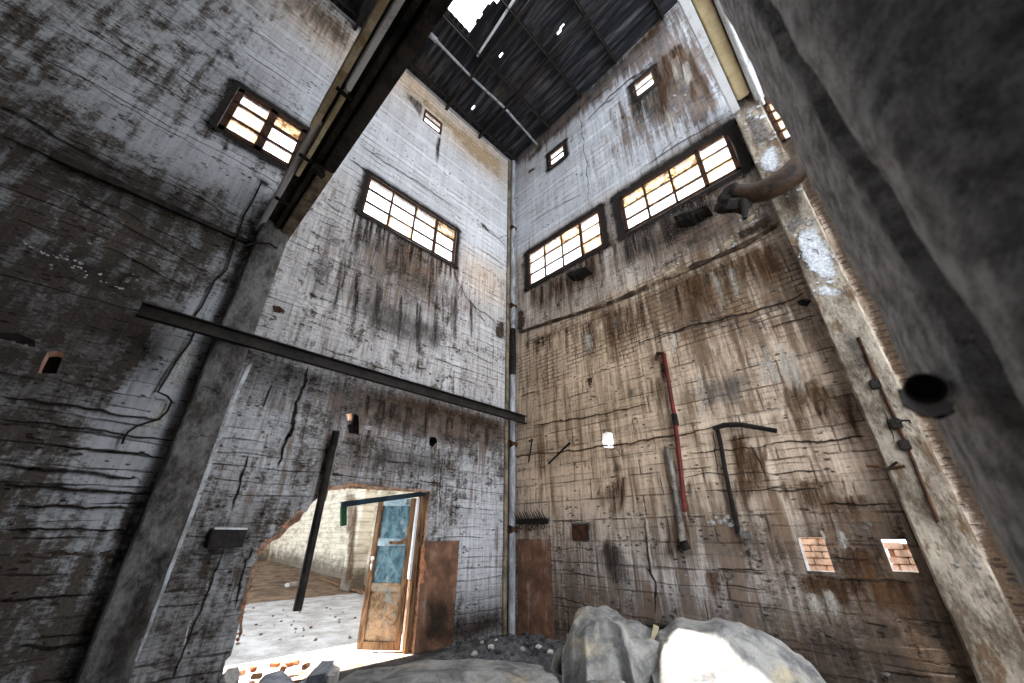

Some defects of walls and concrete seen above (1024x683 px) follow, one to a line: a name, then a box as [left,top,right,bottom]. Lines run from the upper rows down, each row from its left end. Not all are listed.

leakage [632,84,667,120]
leakage [335,215,473,350]
crack [278,368,308,465]
crack [232,455,249,508]
spalling [329,484,427,493]
crack [174,548,253,678]
spalling [236,510,304,642]
leakage [601,542,629,584]
crack [644,519,657,613]